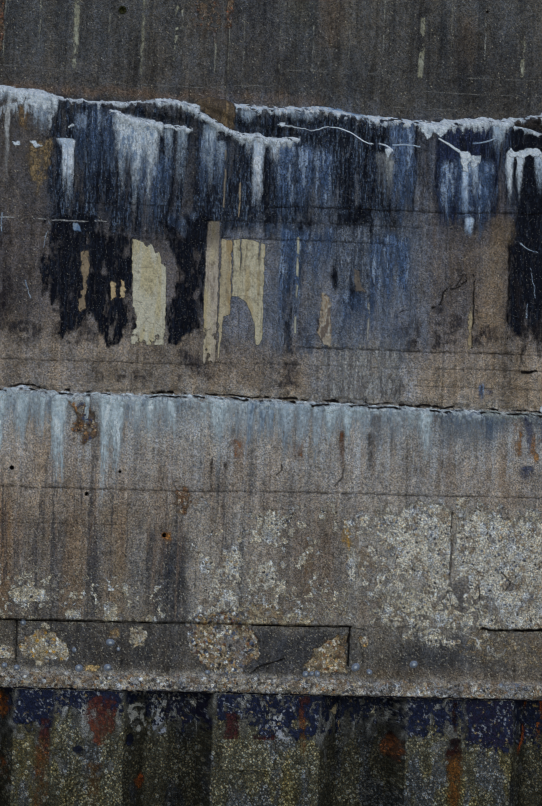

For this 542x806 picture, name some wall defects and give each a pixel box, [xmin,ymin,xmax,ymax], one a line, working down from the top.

peeling [110,239,167,345]
peeling [202,221,265,364]
damp [0,85,542,480]
spalling [68,401,98,444]
corrosion [515,427,540,462]
spalling [172,485,192,515]
spalling [0,497,542,745]
corrosion [84,695,117,746]
corrosion [446,702,463,806]